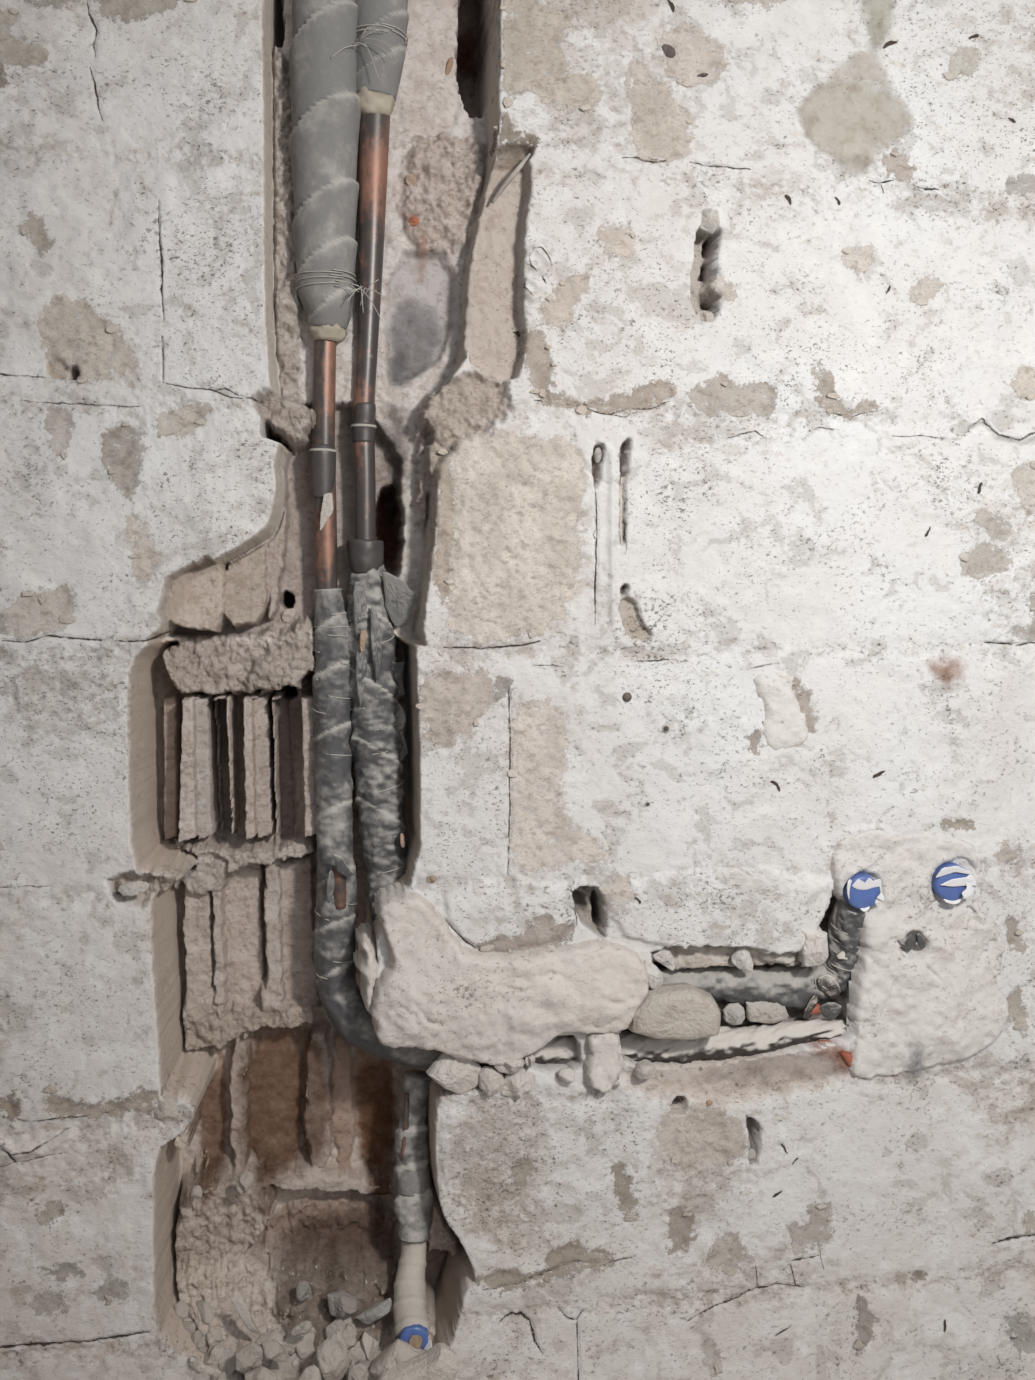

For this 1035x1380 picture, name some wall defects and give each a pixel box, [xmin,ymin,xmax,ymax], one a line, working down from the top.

crack [87,2,103,120]
flaking render [0,0,197,88]
flaking render [882,147,917,183]
flaking render [36,289,139,384]
crack [158,218,262,403]
crack [975,418,1035,441]
flaking render [99,402,213,583]
crack [2,631,171,642]
flaking render [477,912,576,953]
crack [0,1331,148,1348]
crack [483,1257,632,1380]
crack [688,1241,824,1321]